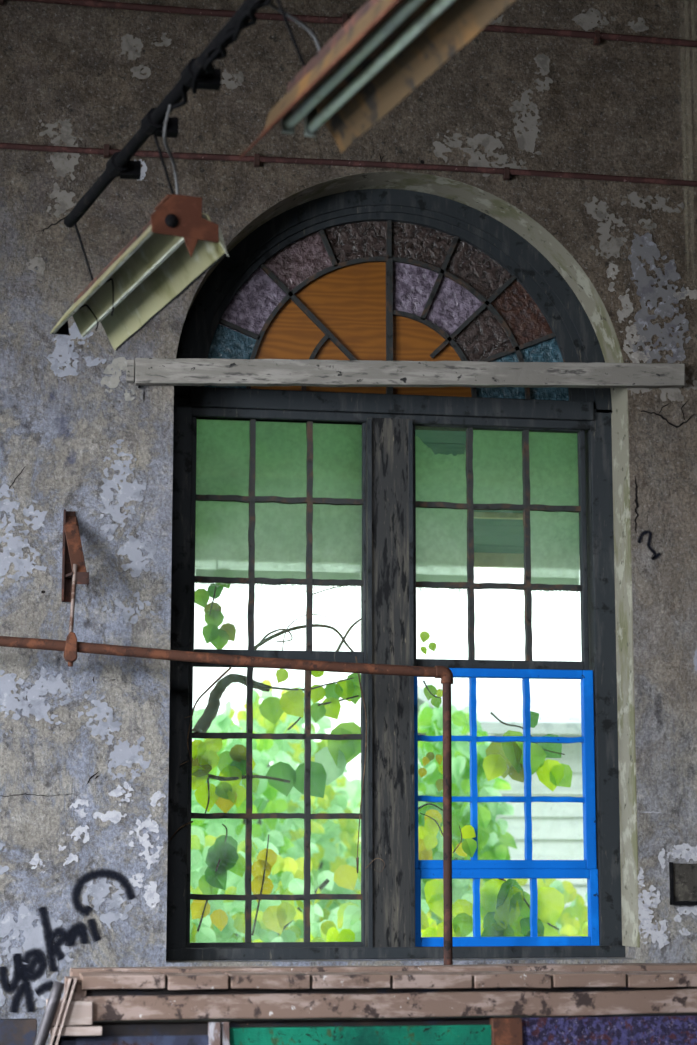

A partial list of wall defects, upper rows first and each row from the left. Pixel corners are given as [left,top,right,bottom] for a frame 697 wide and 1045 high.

peeling [420,47,553,184]
peeling [583,191,697,363]
peeling [46,319,136,401]
peeling [627,374,697,402]
crack [639,402,694,428]
peeling [0,470,50,596]
peeling [98,439,158,577]
peeling [101,592,159,624]
peeling [0,654,166,929]
peeling [0,902,89,1008]
peeling [638,856,697,949]
peeling [658,843,697,869]